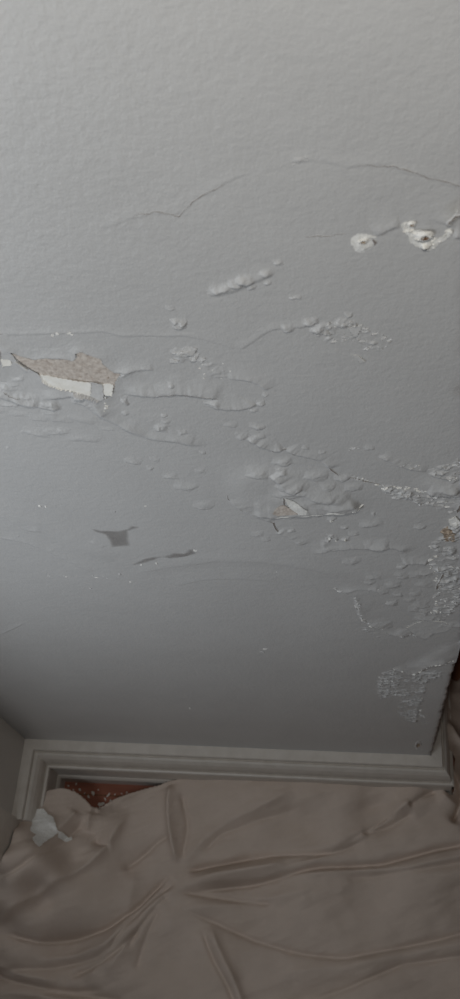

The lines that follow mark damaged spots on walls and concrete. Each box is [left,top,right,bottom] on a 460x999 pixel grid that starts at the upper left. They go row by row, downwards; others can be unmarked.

spalling [351,233,378,253]
peeling [0,341,154,416]
flaking render [374,484,460,621]
flaking render [376,641,460,724]